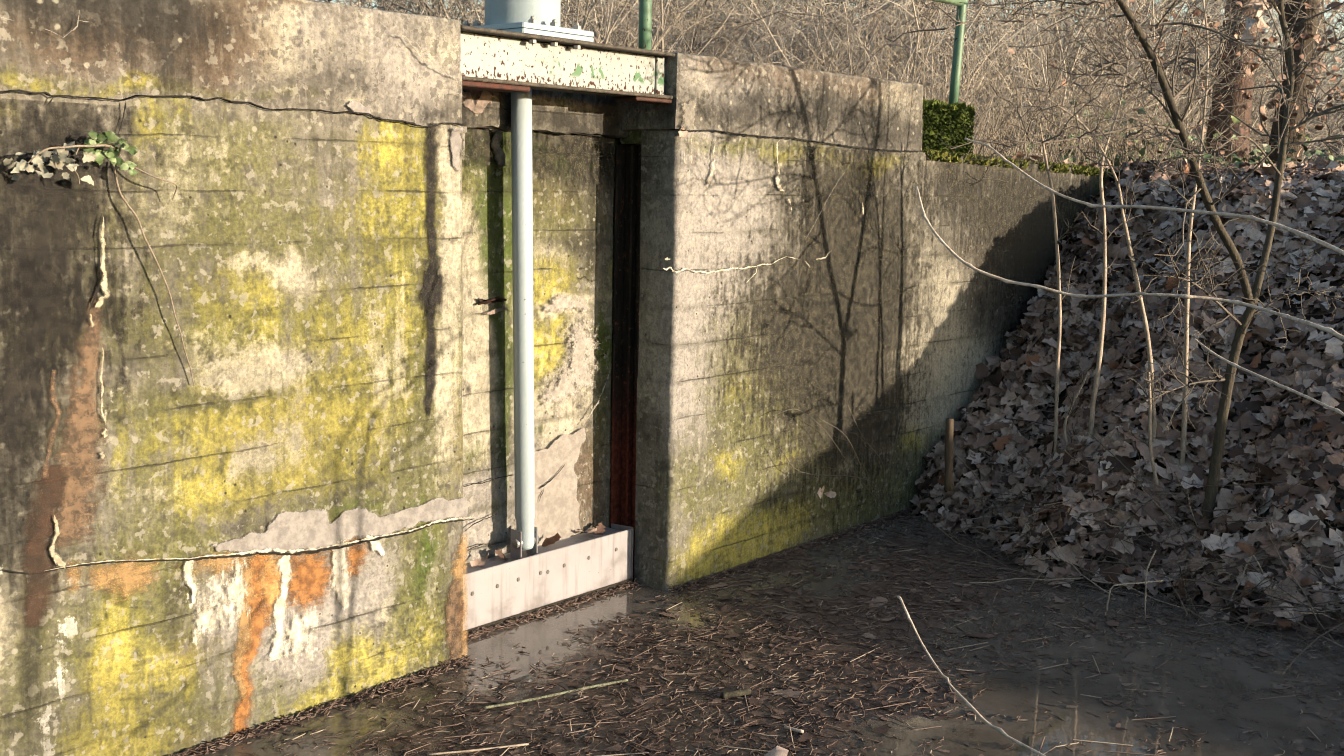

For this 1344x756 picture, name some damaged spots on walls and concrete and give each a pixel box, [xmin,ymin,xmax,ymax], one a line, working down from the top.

crack [0,34,493,135]
damp [0,99,133,592]
crack [89,213,110,327]
damp [419,123,444,415]
crack [663,129,922,282]
damp [711,141,1097,533]
rust [24,299,158,627]
rust [192,540,367,738]
crack [2,464,565,575]
damp [269,555,313,661]
peeling [212,497,468,552]
rust [446,537,468,661]